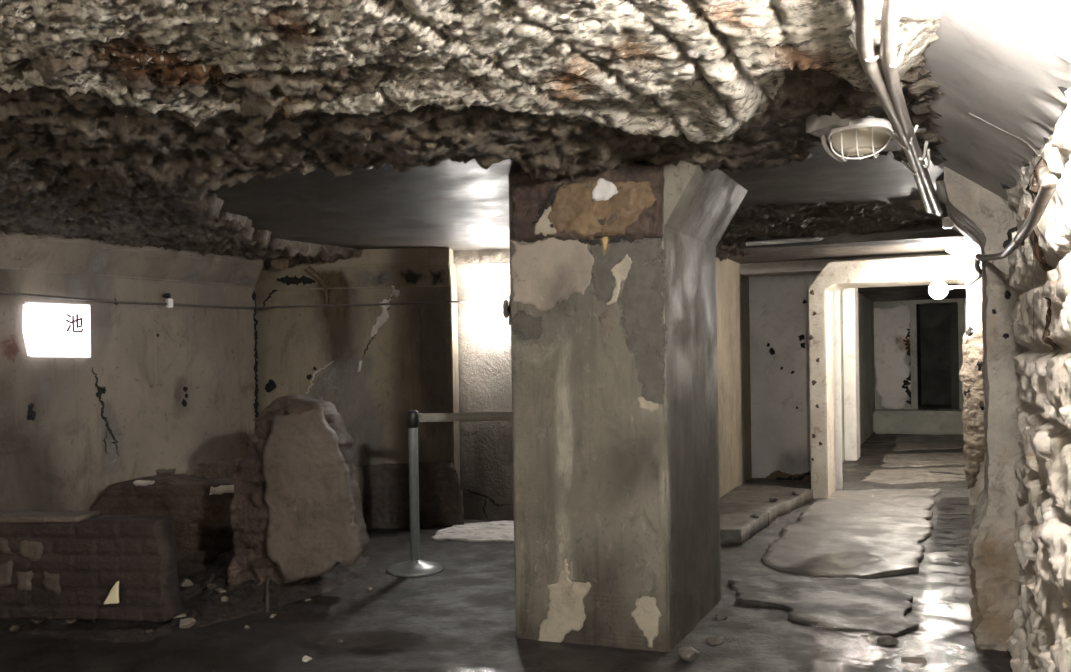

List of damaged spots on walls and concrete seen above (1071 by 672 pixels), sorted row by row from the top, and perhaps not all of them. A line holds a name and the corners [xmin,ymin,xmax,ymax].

rust [93,39,245,89]
crack [92,368,119,466]
crack [252,290,277,424]
spalling [509,161,667,648]